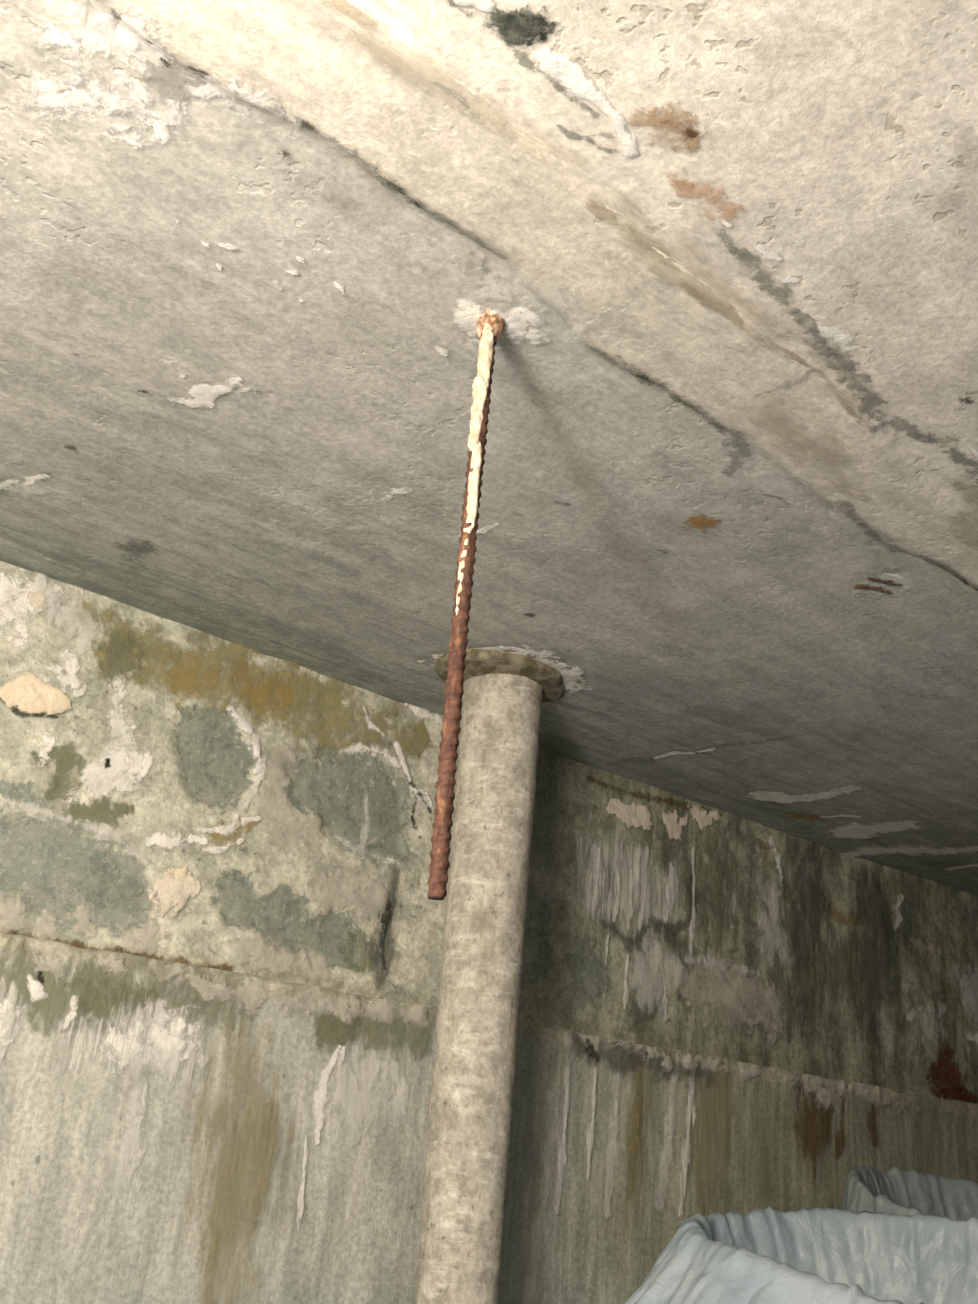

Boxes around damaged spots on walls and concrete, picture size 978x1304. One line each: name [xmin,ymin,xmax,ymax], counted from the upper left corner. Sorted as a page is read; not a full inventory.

water stain [446,0,638,158]
crack [557,125,616,153]
rust [631,106,703,153]
rust [668,173,743,220]
crack [587,346,750,474]
crack [717,228,978,486]
spalling [427,299,560,900]
rust [686,515,721,532]
flaking render [175,704,409,866]
flaking render [0,780,429,1027]
water stain [63,995,275,1304]
water stain [580,1034,923,1218]